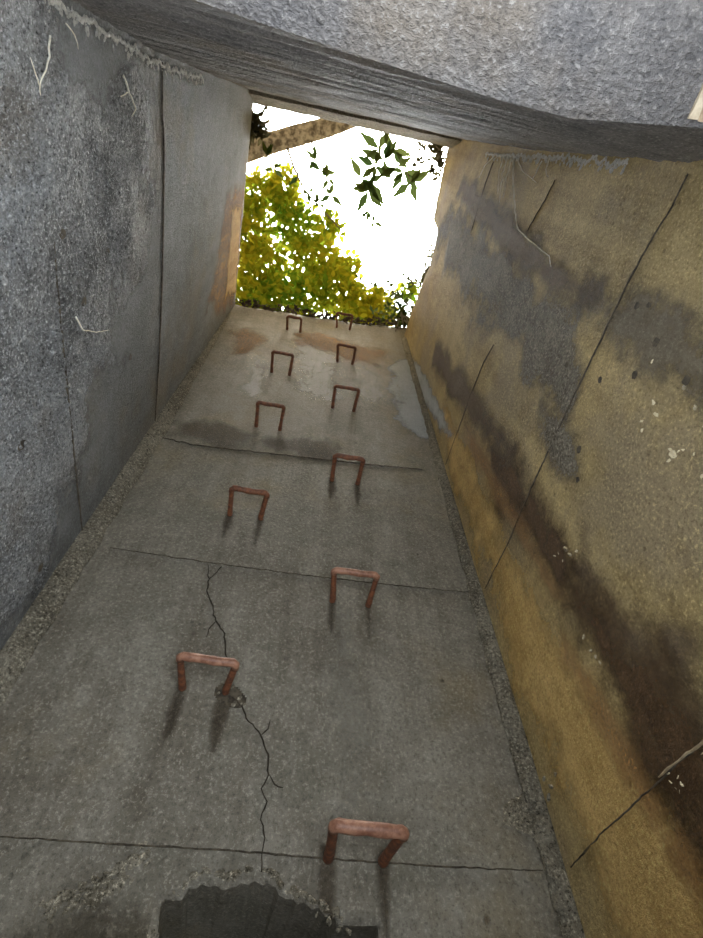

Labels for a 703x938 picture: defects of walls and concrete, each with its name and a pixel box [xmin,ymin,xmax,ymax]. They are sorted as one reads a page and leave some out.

spalling [0,0,204,633]
spalling [164,866,352,937]
crack [0,697,543,872]
leakage [387,343,703,858]